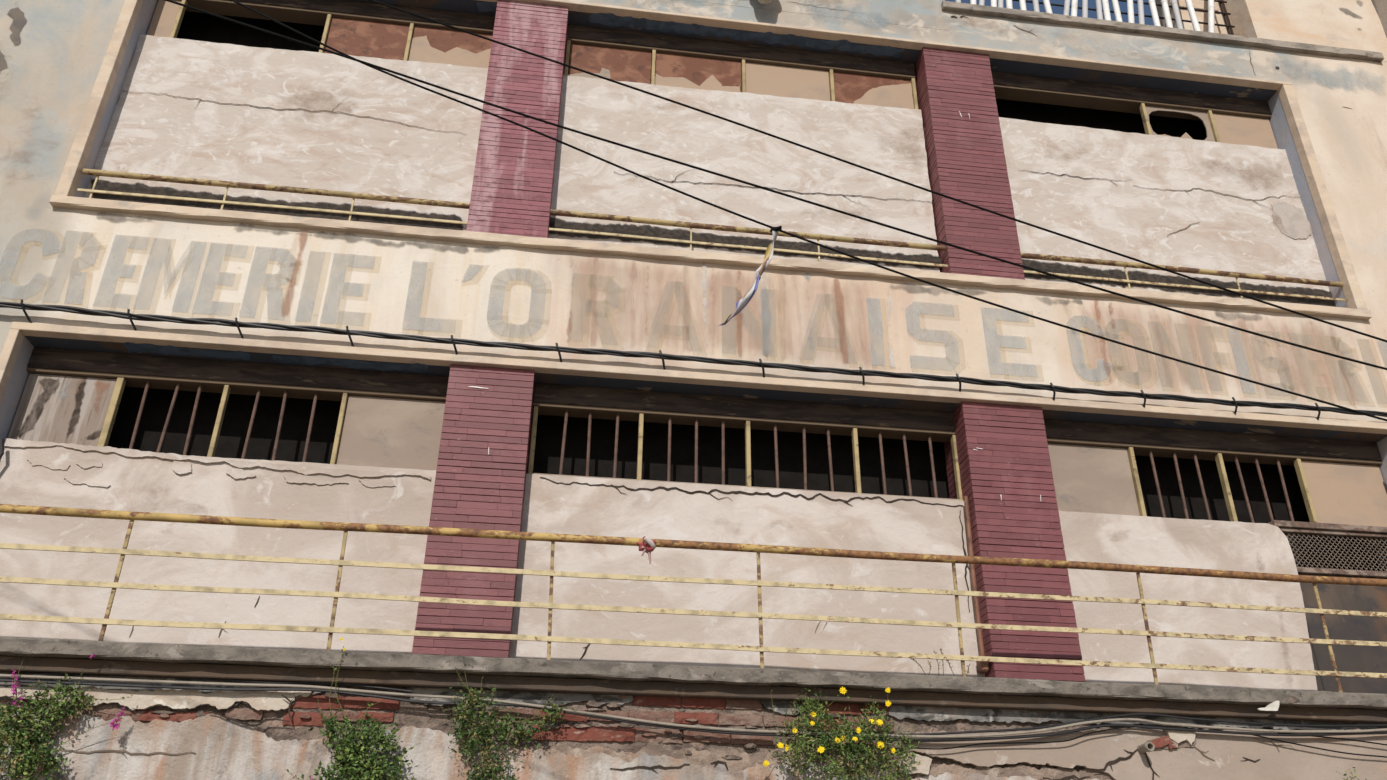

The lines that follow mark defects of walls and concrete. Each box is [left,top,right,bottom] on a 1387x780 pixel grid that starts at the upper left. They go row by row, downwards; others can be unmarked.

peeling [0,7,27,94]
crack [1020,170,1292,234]
flaking render [4,438,431,488]
crack [540,477,971,612]
spalling [24,689,431,741]
spalling [448,690,906,759]
flaking render [897,753,932,775]
spalling [1145,730,1197,750]